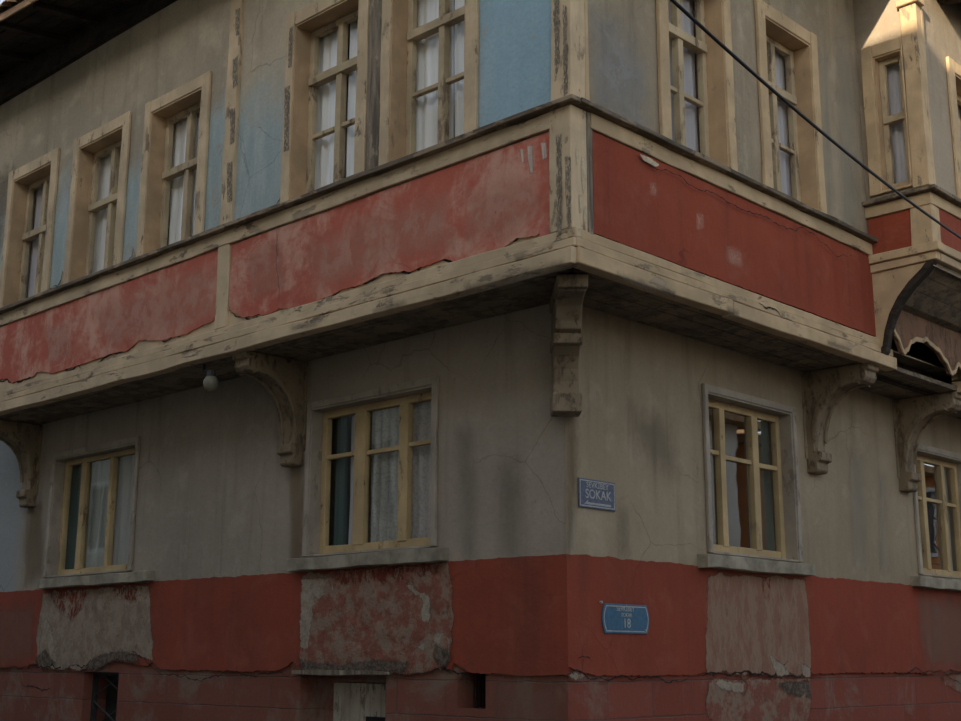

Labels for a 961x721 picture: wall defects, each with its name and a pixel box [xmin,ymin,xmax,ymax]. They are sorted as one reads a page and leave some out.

peeling [553,0,568,96]
peeling [539,134,587,237]
crack [229,231,282,320]
crack [324,259,453,299]
spalling [35,585,153,671]
spalling [299,562,454,675]
spalling [705,572,811,698]